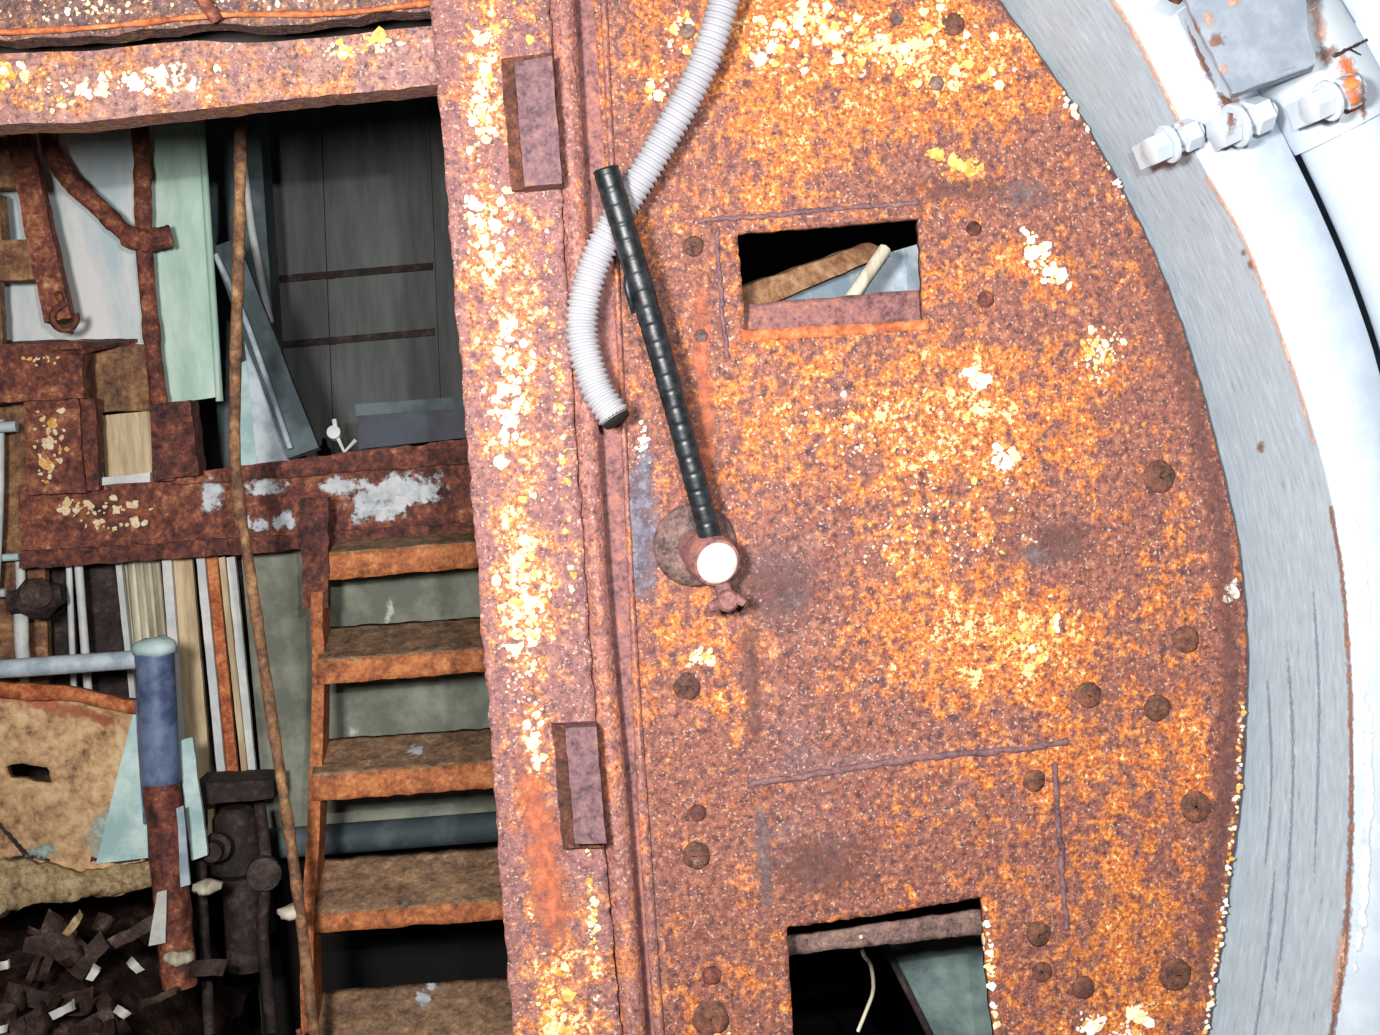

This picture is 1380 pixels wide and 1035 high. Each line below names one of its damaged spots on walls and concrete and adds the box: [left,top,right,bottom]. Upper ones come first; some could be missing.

corrosion [1111,0,1183,127]
corrosion [1188,14,1238,126]
corrosion [1310,5,1366,117]
corrosion [695,297,714,477]
corrosion [1206,176,1315,445]
corrosion [1132,241,1241,1005]